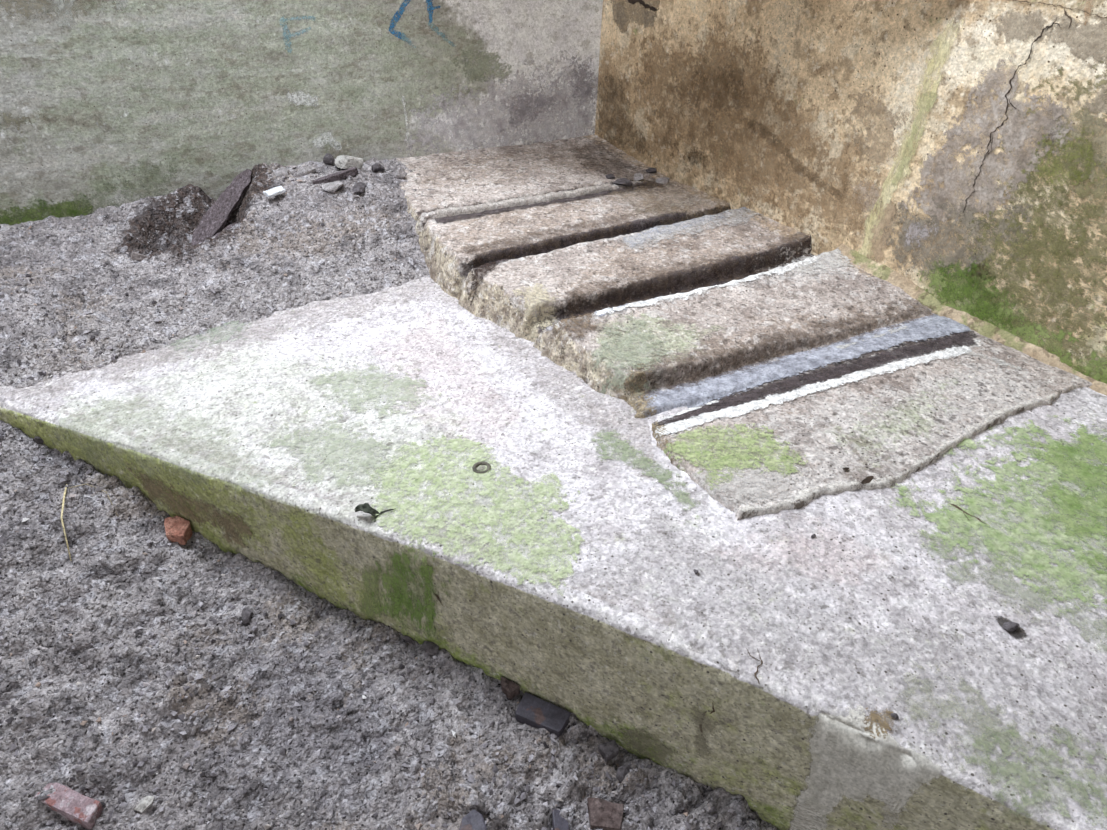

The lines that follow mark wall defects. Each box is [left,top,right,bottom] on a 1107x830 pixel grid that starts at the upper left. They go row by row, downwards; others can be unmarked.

crack [963,0,1107,215]